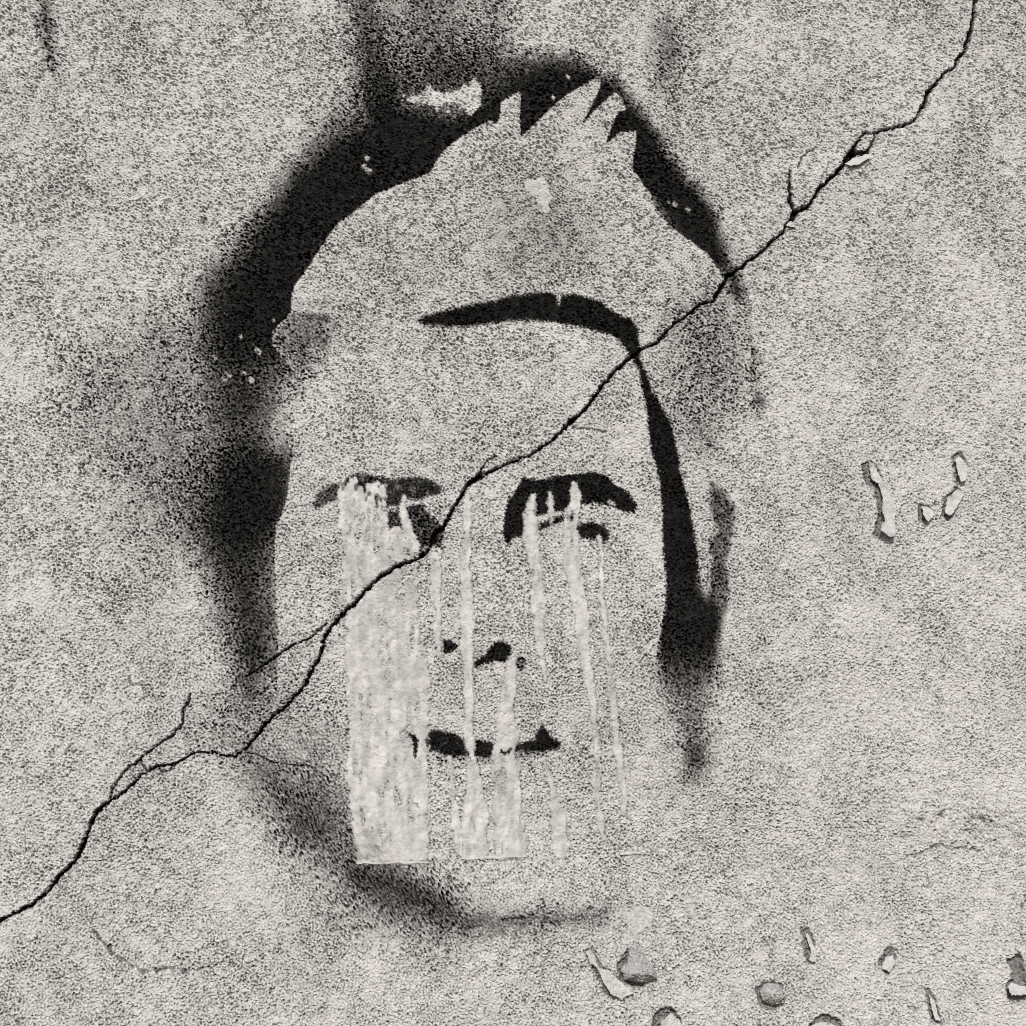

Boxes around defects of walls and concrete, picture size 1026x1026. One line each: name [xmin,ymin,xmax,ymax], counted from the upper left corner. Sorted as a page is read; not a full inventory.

crack [244,0,977,750]
peeling [861,460,897,539]
peeling [918,451,967,528]
crack [0,693,242,923]
peeling [584,941,657,1000]
peeling [652,1006,682,1026]
peeling [755,981,786,1010]
peeling [800,927,817,962]
peeling [809,1014,842,1026]
peeling [878,946,897,975]
peeling [924,988,942,1024]
peeling [1006,953,1026,1000]